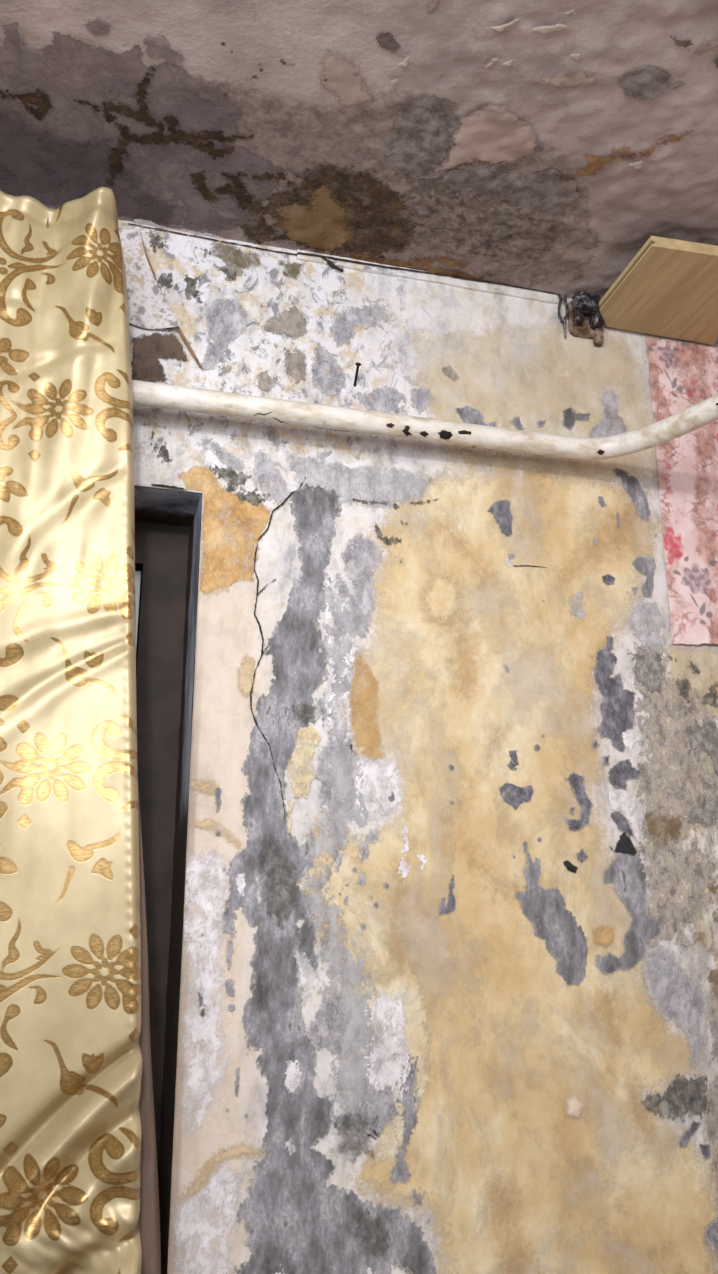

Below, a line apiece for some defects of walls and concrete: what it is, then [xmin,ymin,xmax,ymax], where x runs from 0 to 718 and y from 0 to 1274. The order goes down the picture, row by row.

peeling [376,32,410,87]
peeling [490,9,575,34]
leakage [0,18,600,287]
peeling [387,95,582,262]
leakage [154,272,206,305]
leakage [422,329,651,438]
crack [250,477,306,817]
peeling [209,440,437,1274]
leakage [169,444,718,1274]
spalling [439,875,456,916]
spalling [513,556,718,1066]
spalling [679,1088,718,1187]